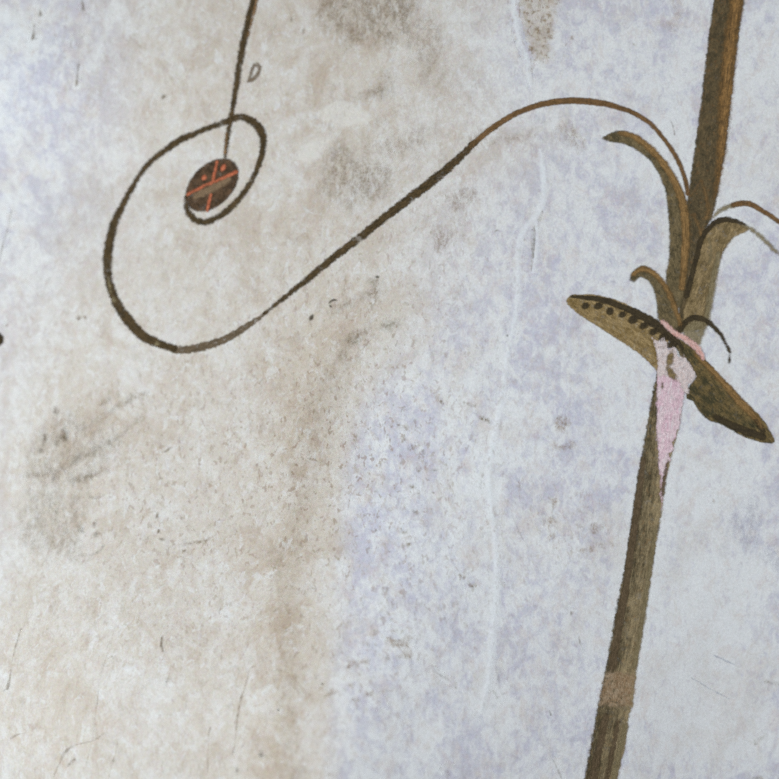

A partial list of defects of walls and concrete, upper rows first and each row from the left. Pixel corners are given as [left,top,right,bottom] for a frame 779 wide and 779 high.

crack [508,0,536,90]
peeling [505,0,573,75]
crack [476,145,552,716]